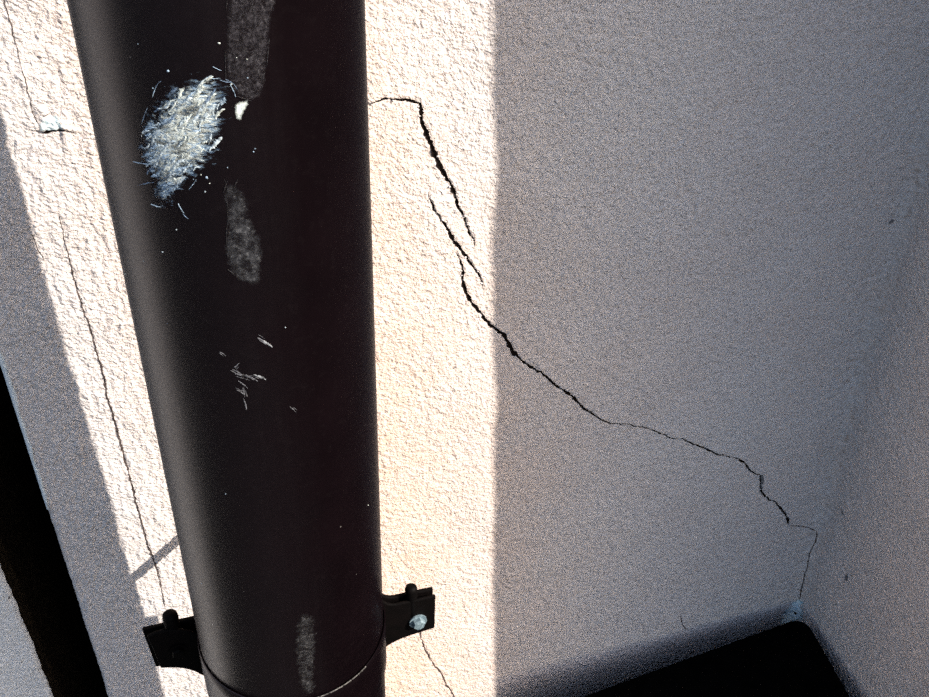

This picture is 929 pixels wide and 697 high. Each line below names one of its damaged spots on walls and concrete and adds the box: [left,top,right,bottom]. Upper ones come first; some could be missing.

crack [368,98,817,600]
crack [420,632,455,697]